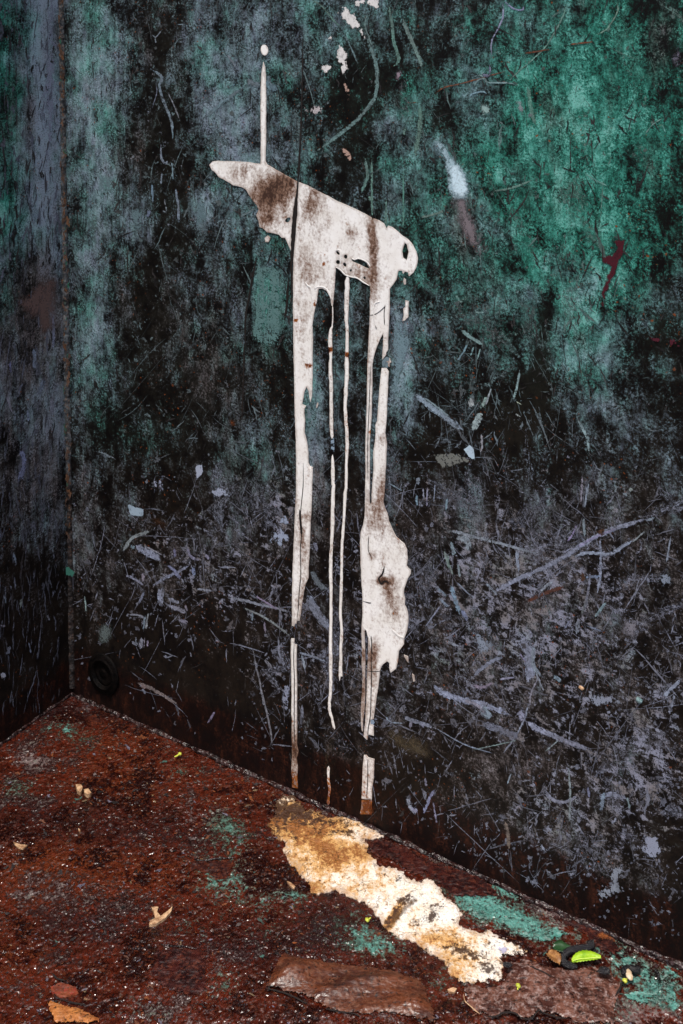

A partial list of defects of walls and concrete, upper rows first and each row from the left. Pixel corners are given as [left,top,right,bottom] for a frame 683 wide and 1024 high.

corrosion [189,856,235,881]
corrosion [368,838,498,898]
leakage [388,899,417,928]
corrosion [551,916,619,955]
corrosion [48,982,100,1023]
corrosion [148,944,207,996]
corrosion [266,952,435,1022]
corrosion [463,959,620,1024]